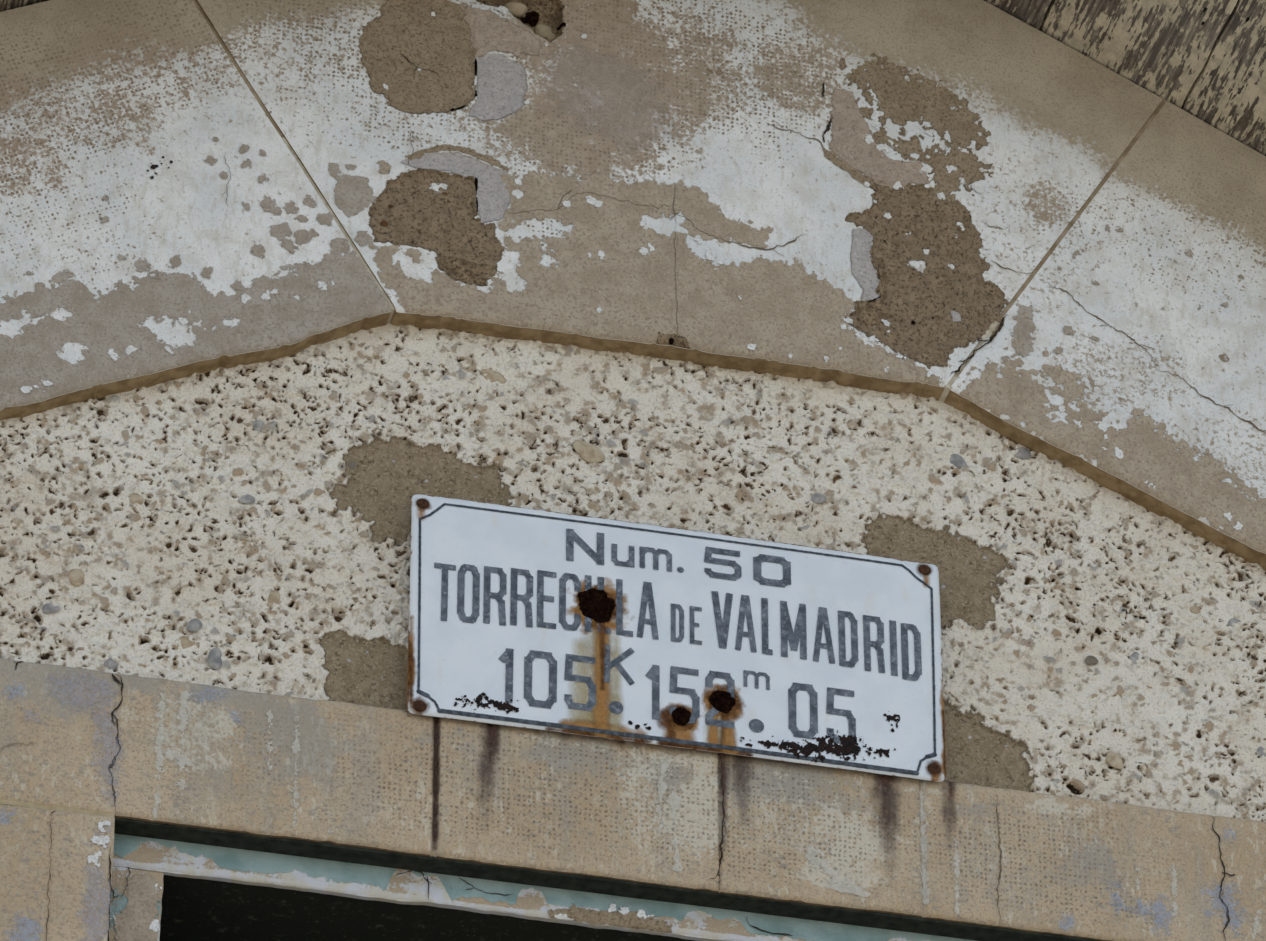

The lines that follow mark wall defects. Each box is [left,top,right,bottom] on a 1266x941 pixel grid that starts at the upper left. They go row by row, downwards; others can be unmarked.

spalling [359,0,566,114]
peeling [0,53,1266,553]
crack [991,260,1266,431]
spalling [861,513,1012,629]
spalling [319,629,408,711]
rust [547,581,752,756]
crack [108,674,124,816]
spalling [943,698,1036,792]
peeling [548,903,672,933]
crack [1212,818,1235,941]